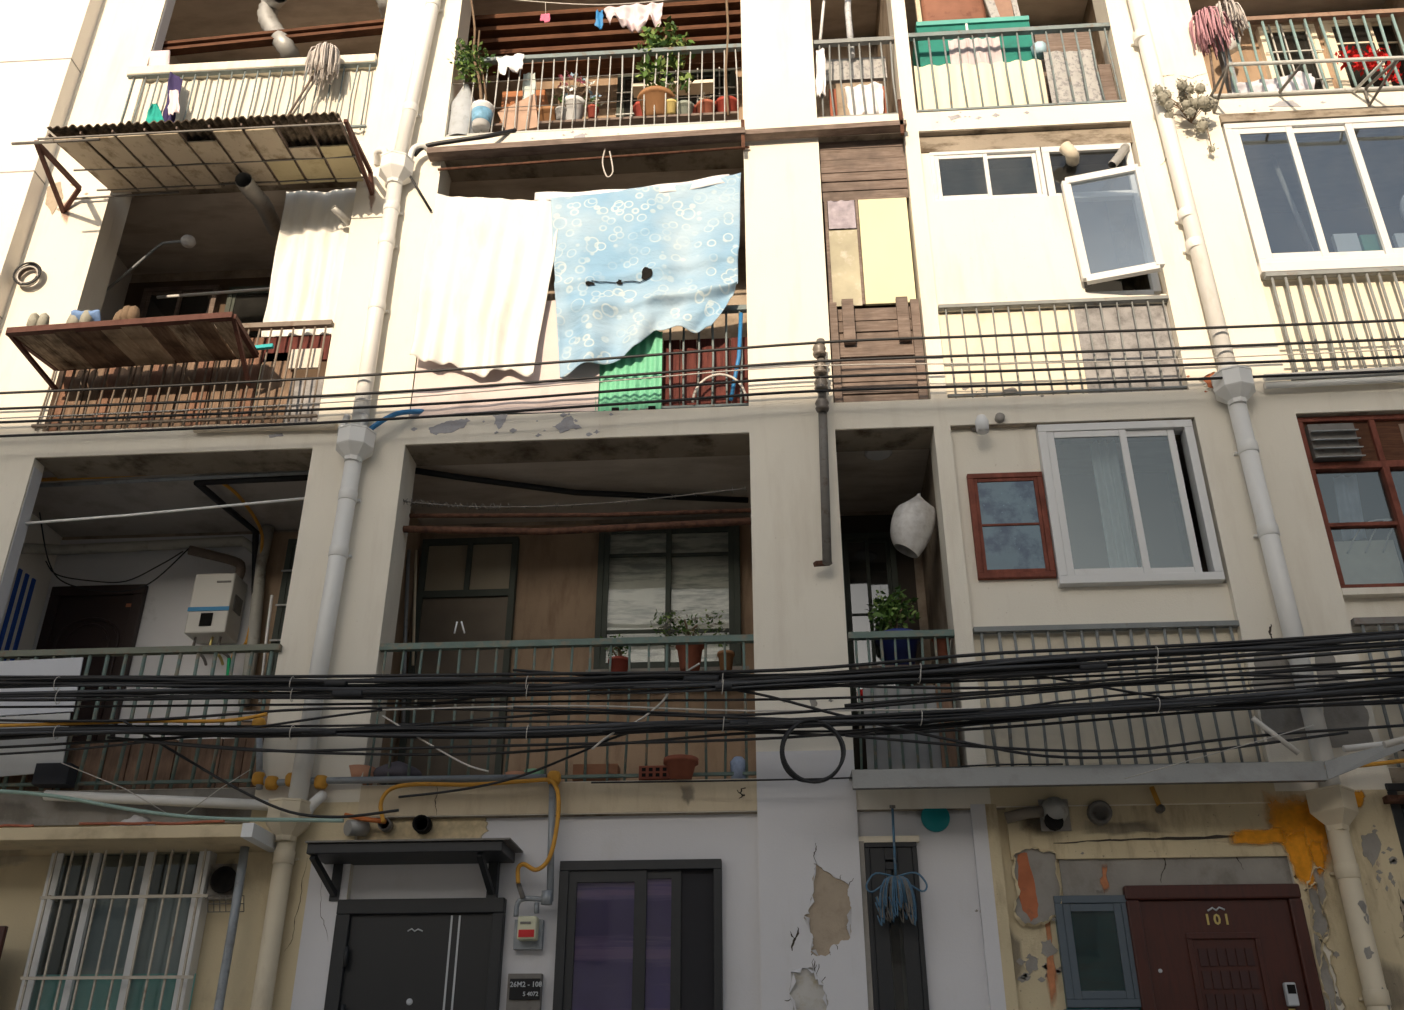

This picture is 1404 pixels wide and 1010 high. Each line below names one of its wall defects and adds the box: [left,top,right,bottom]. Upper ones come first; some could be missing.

peeling [411,414,517,435]
peeling [535,413,599,437]
flaking render [785,864,854,1010]
peeling [1012,847,1062,983]
peeling [1294,866,1346,1010]